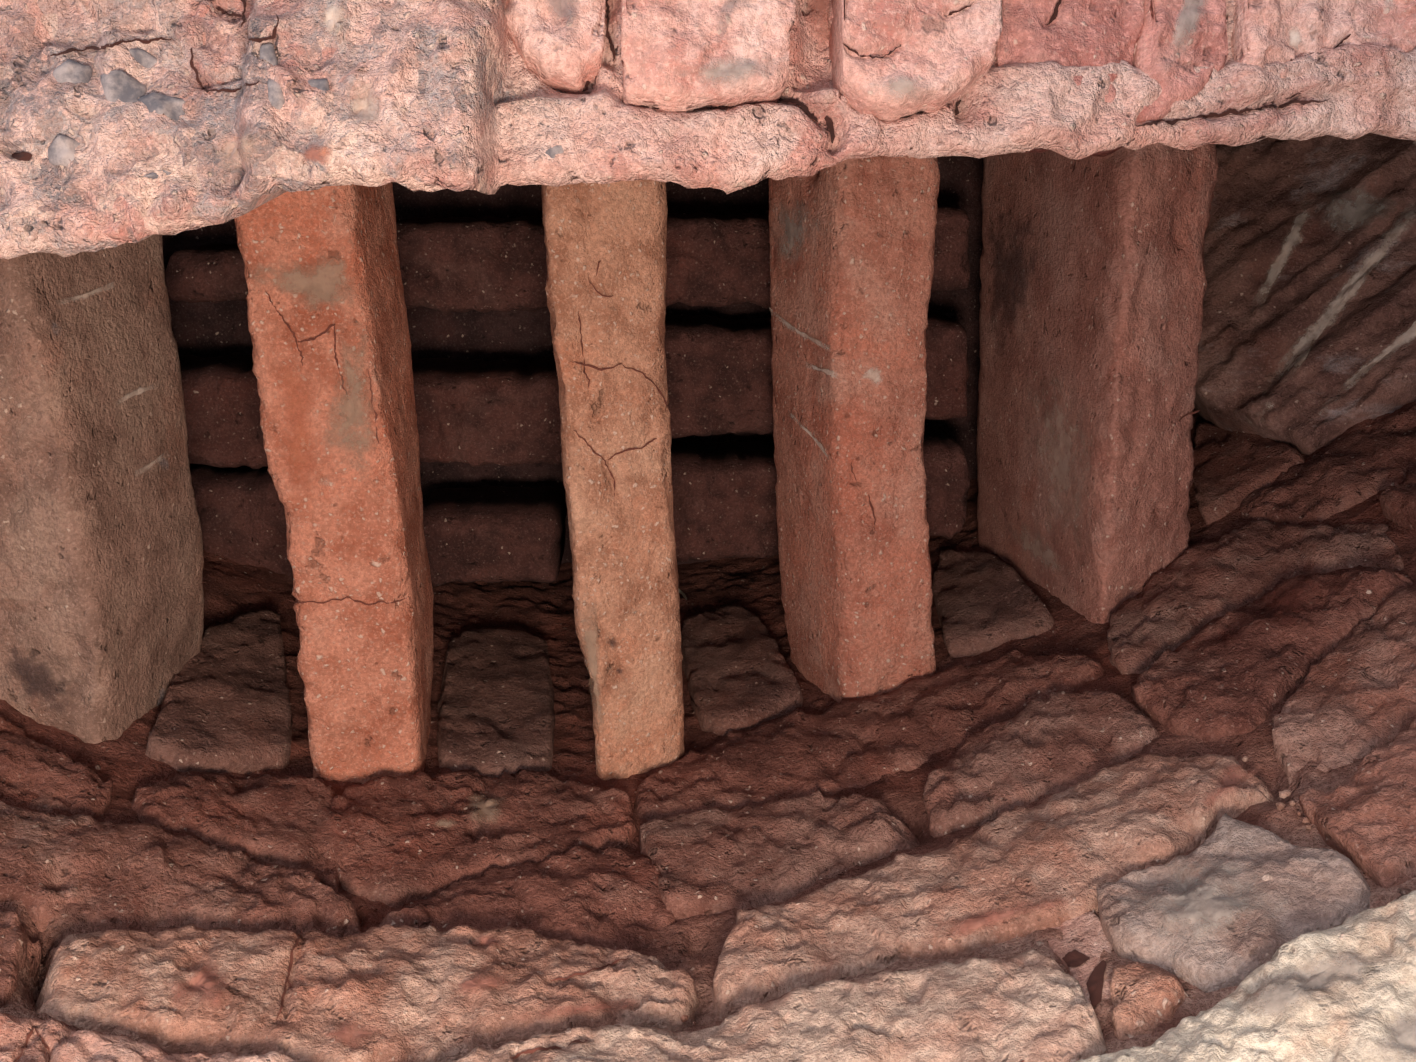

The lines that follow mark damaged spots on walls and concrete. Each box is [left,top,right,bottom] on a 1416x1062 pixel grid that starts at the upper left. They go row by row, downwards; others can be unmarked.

crack [216,0,279,43]
crack [50,37,259,93]
crack [1135,98,1330,127]
crack [572,260,669,496]